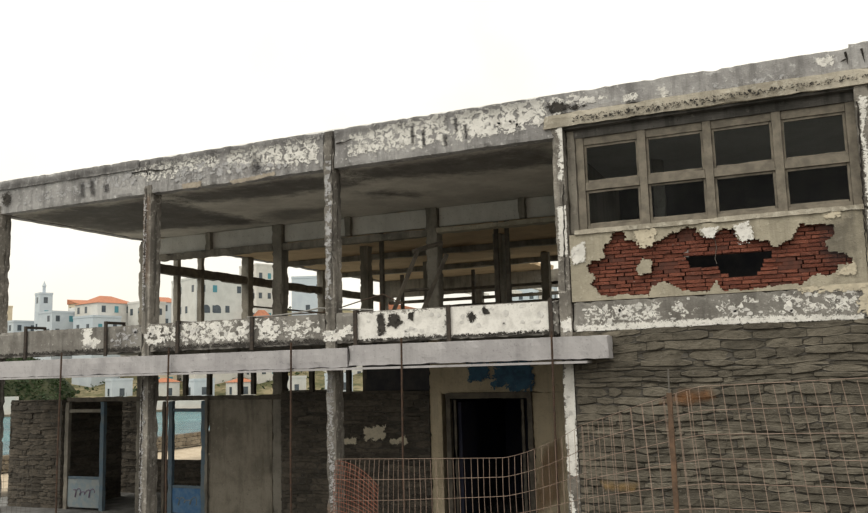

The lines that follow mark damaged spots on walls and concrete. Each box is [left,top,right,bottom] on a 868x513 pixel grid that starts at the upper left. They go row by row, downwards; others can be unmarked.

peeling [23,133,332,300]
peeling [555,127,564,180]
peeling [343,73,868,159]
peeling [813,55,835,67]
peeling [856,95,868,223]
flaking render [0,205,868,357]